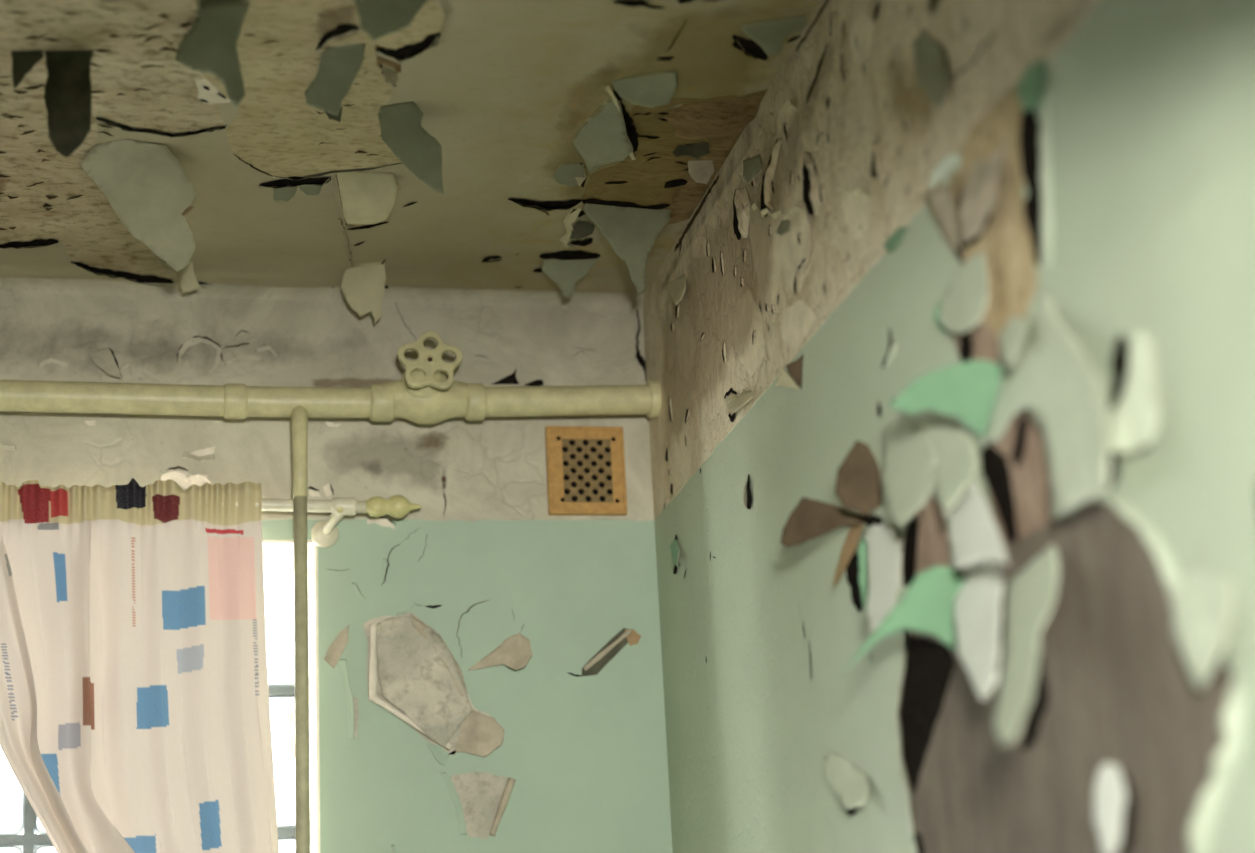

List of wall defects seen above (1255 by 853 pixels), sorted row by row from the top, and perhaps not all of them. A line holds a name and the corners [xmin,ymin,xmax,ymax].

flaking render [0,0,454,293]
peeling [732,15,806,65]
peeling [724,154,816,422]
flaking render [778,57,1248,853]
peeling [324,605,533,839]
peeling [568,628,641,677]